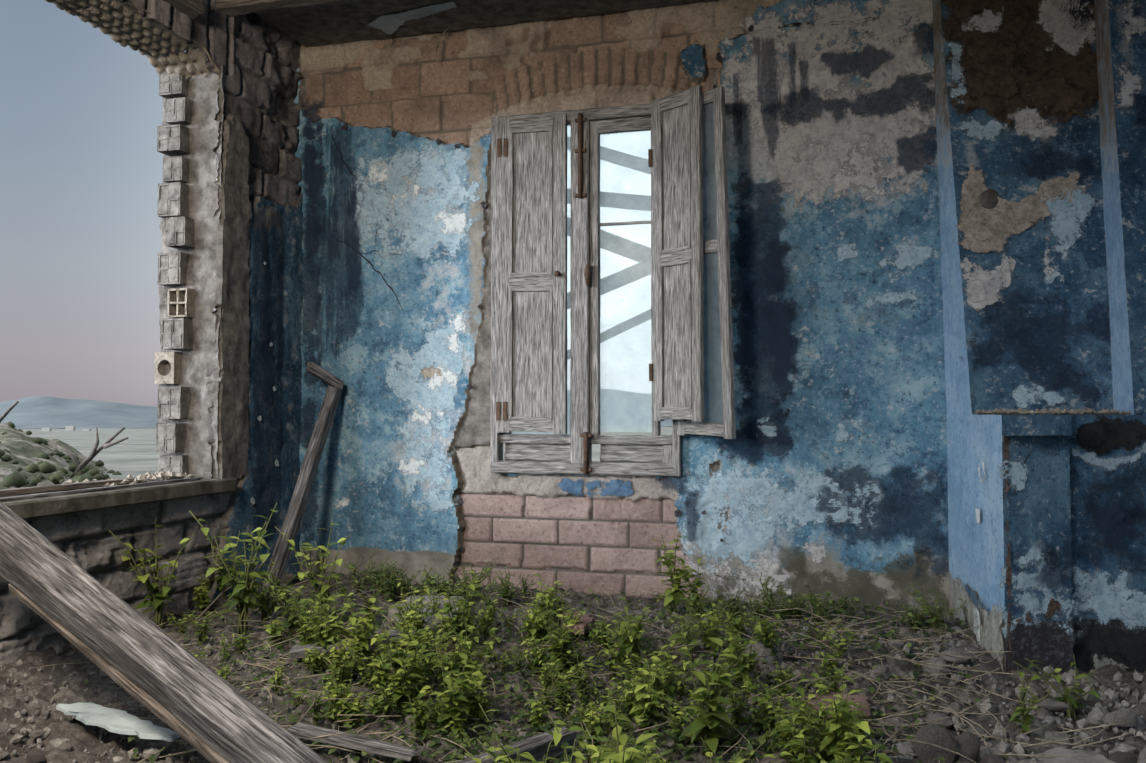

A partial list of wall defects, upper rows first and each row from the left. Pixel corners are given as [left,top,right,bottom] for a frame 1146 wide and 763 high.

spalling [298,0,943,602]
water stain [657,172,949,603]
spalling [957,166,1096,310]
water stain [1070,442,1146,673]